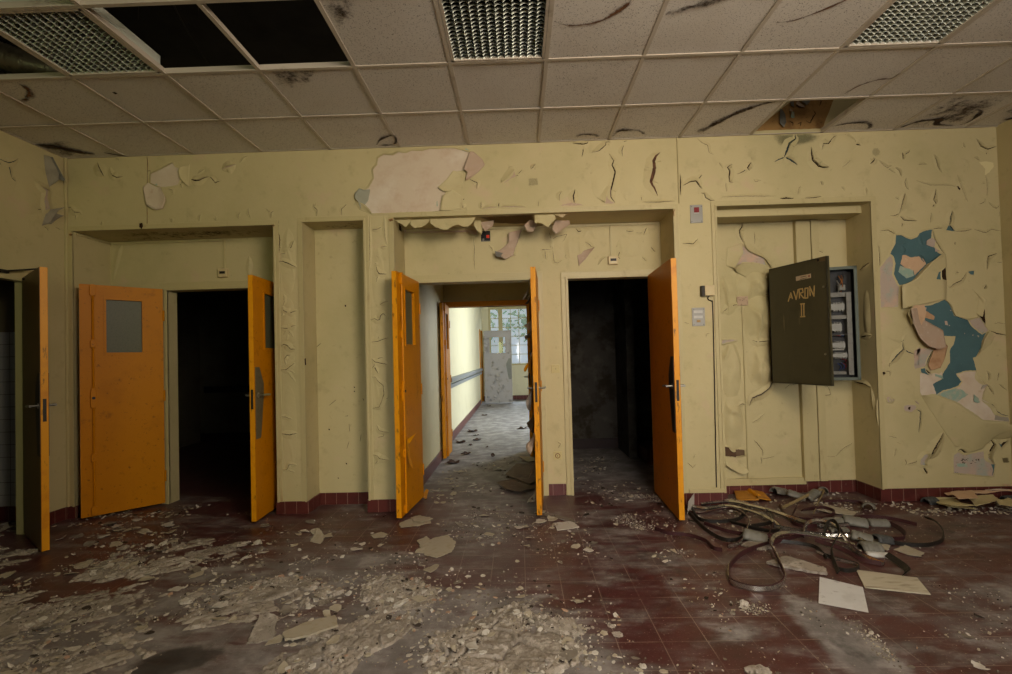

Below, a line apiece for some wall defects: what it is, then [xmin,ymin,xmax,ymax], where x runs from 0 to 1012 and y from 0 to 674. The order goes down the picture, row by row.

damp [902,97,996,127]
peeling [143,162,190,210]
peeling [354,146,485,237]
crack [469,101,1001,289]
peeling [878,228,1010,423]
crack [371,356,389,465]